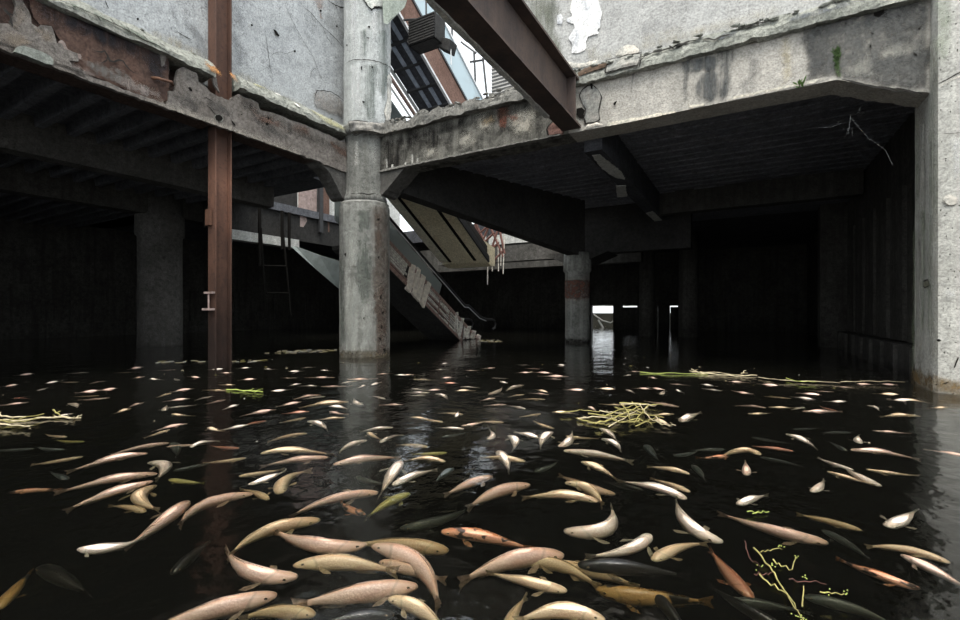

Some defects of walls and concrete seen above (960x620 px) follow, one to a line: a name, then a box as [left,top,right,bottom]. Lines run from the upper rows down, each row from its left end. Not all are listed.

spalling [29,0,174,103]
peeling [557,0,639,89]
crack [579,21,770,124]
water stain [682,50,729,101]